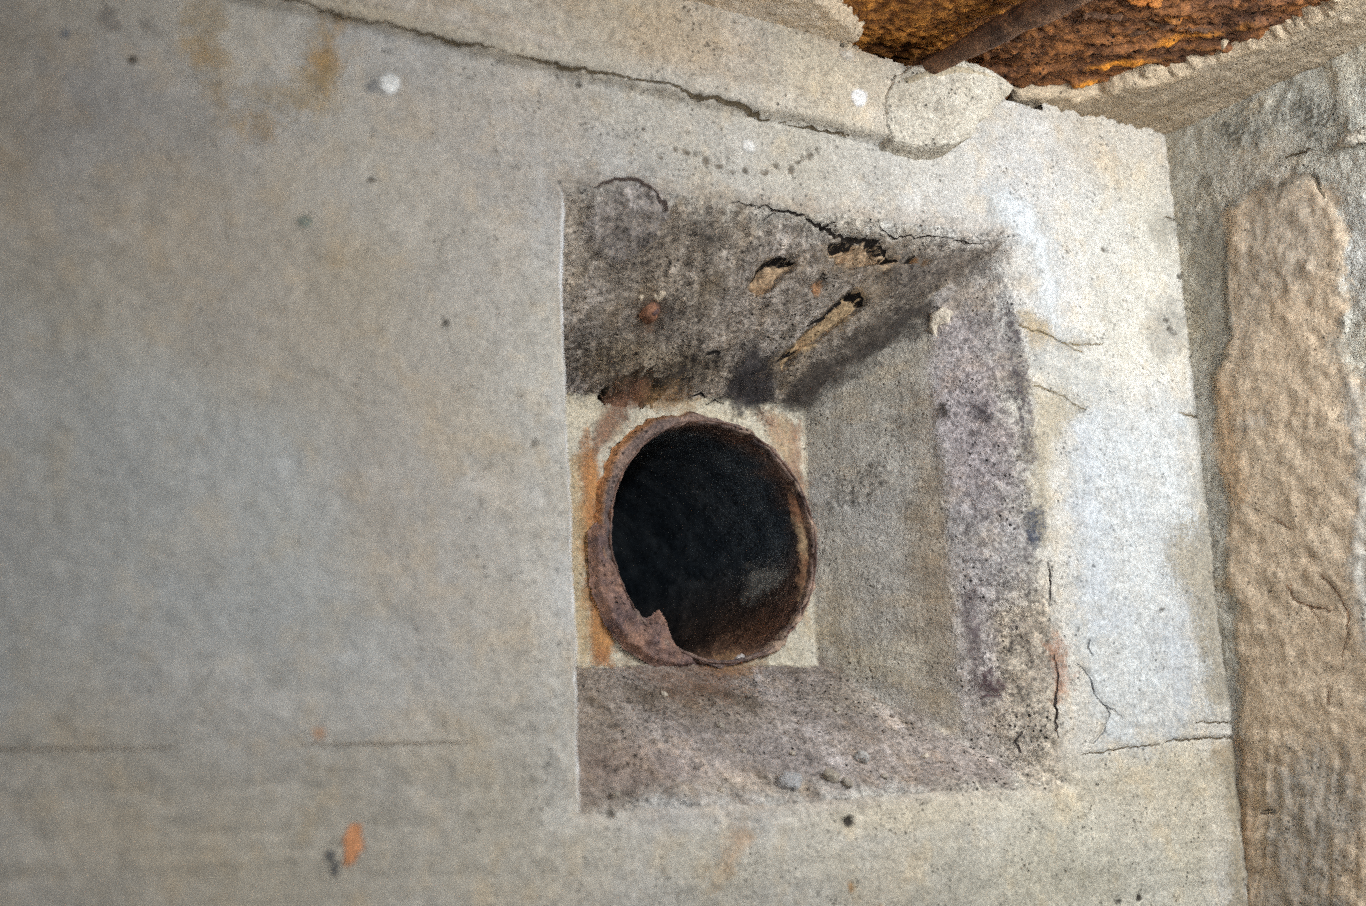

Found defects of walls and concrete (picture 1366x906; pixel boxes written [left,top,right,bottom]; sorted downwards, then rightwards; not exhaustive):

crack [285,0,849,137]
corrosion [912,0,1212,75]
spalling [749,257,795,296]
spalling [826,243,926,271]
spalling [776,288,880,371]
water stain [1006,312,1037,464]
corrosion [579,381,646,665]
water stain [1027,506,1047,544]
crack [1046,562,1054,601]
water stain [965,588,1005,697]
crack [1013,639,1232,755]